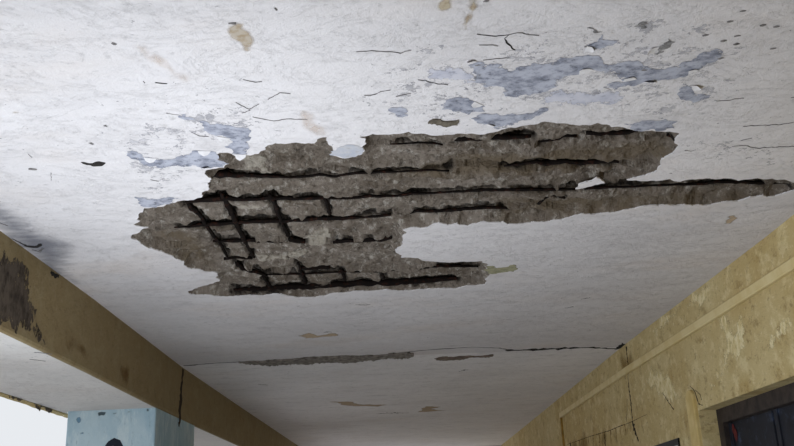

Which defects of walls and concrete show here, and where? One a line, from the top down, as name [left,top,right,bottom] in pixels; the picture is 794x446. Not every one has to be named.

water stain [229,24,252,51]
spalling [124,17,794,297]
water stain [13,236,54,256]
crack [178,362,236,426]
crack [409,343,647,445]